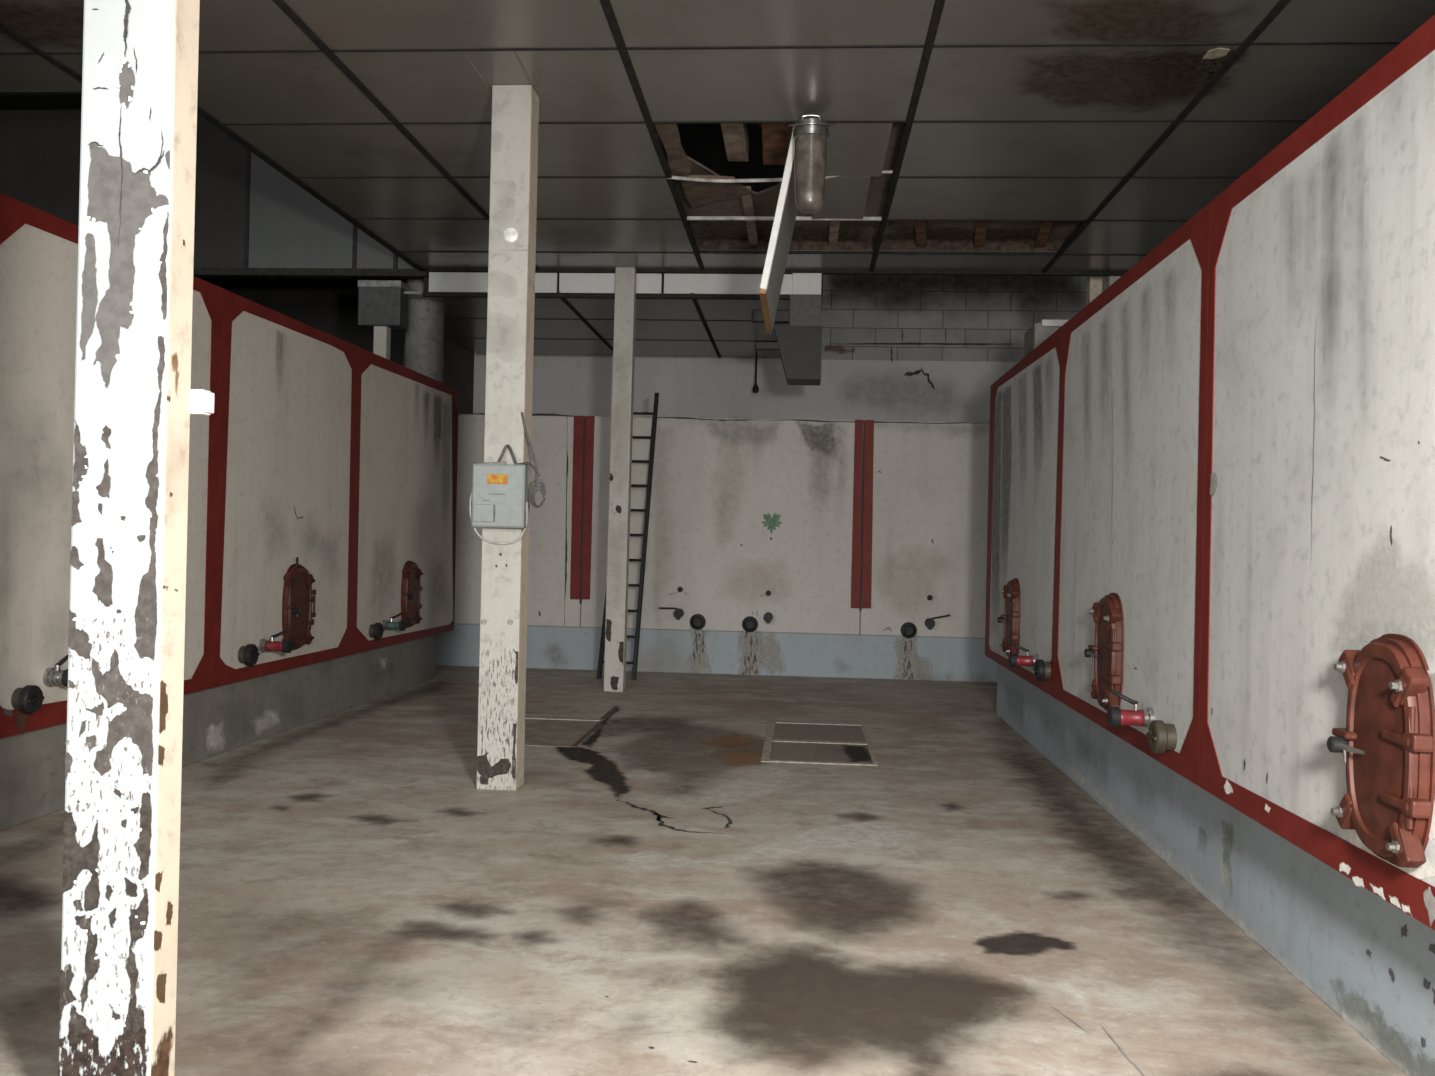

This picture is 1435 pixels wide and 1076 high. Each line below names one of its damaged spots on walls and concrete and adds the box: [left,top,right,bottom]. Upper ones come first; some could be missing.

peeling [117,58,135,109]
leakage [1028,0,1232,107]
peeling [58,144,186,1076]
peeling [477,649,518,790]
crack [616,798,733,834]
leakage [609,814,918,934]
spalling [1339,803,1435,938]
leakage [717,949,1014,1066]